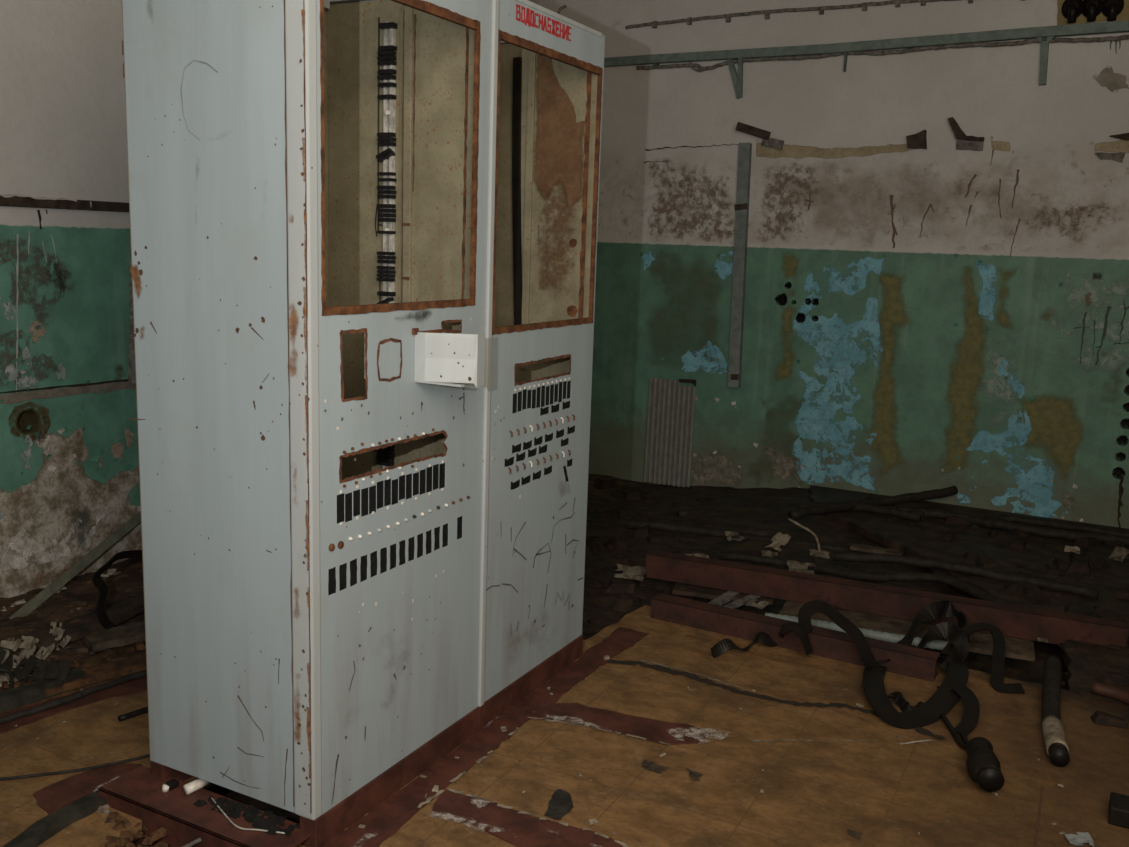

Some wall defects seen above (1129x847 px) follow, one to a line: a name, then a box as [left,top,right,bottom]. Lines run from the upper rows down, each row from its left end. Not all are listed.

damp [651,162,732,239]
damp [763,168,834,235]
flaking render [0,359,142,598]
peeling [676,341,729,375]
peeling [753,254,907,492]
peeling [941,260,1084,522]